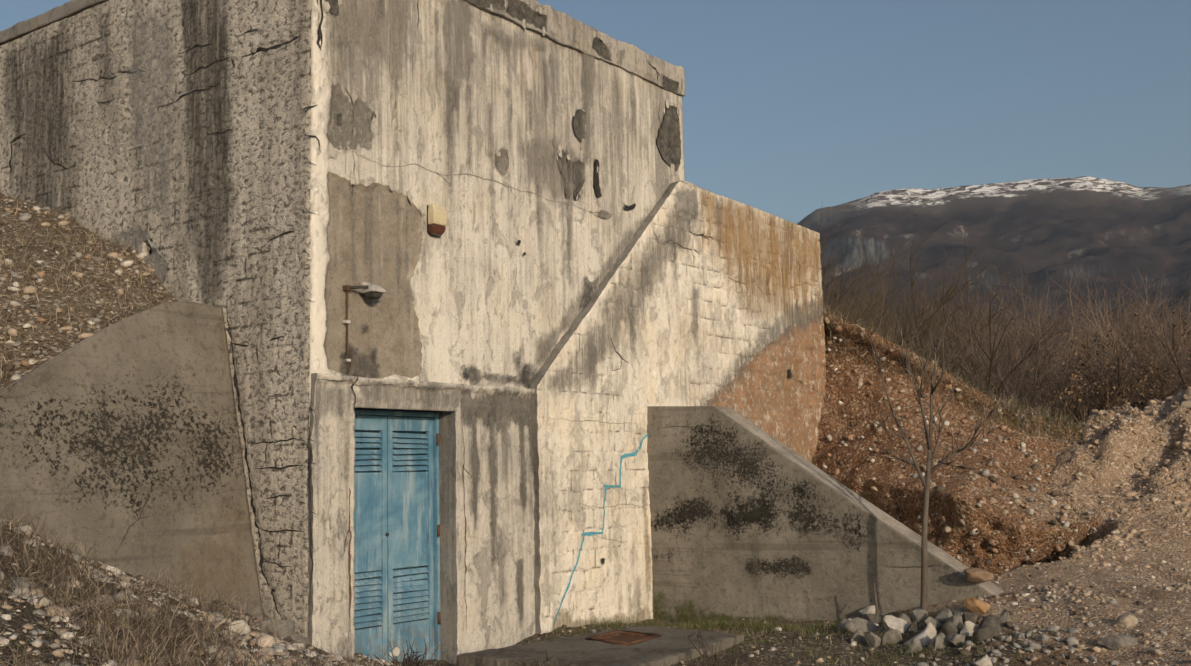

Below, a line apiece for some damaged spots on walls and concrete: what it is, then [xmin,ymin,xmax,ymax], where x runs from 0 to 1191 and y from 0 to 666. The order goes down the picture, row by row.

peeling [323,78,426,378]
leakage [435,0,557,161]
spalling [496,142,509,175]
leakage [522,50,595,266]
spalling [552,108,636,219]
spalling [592,32,611,60]
spalling [656,75,681,176]
leakage [0,376,245,519]
crack [225,307,469,622]
leakage [341,190,698,620]
leakage [644,417,868,569]
leakage [745,555,812,579]